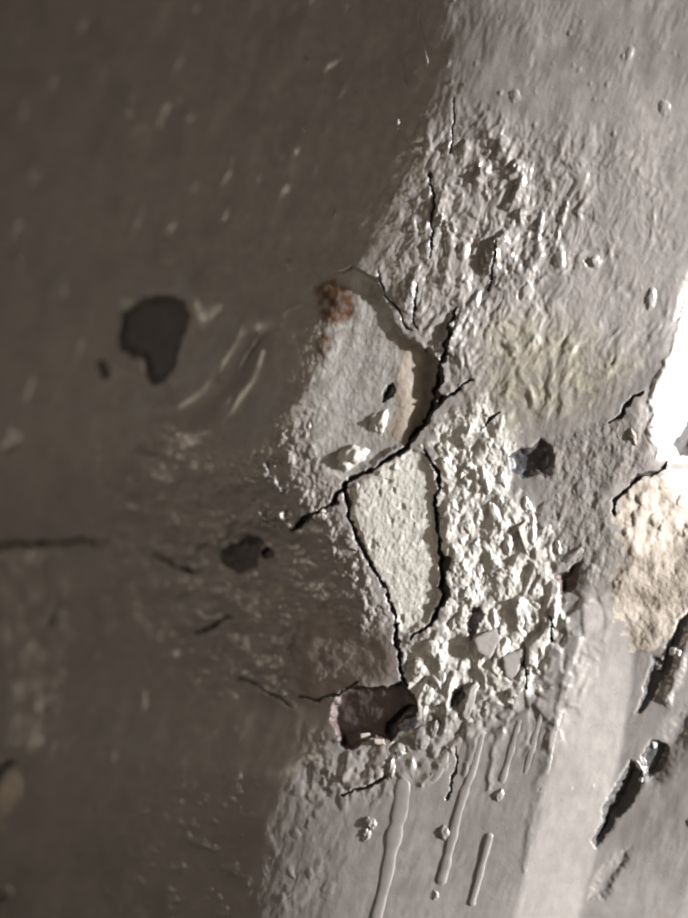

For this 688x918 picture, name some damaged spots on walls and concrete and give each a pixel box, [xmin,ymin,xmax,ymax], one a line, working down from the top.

corrosion [310,272,365,367]
crack [378,270,418,331]
crack [608,392,644,424]
crack [291,307,474,688]
crack [612,462,667,517]
crack [0,538,98,551]
spalling [266,266,688,809]
crack [238,678,359,707]
spalling [591,739,670,848]